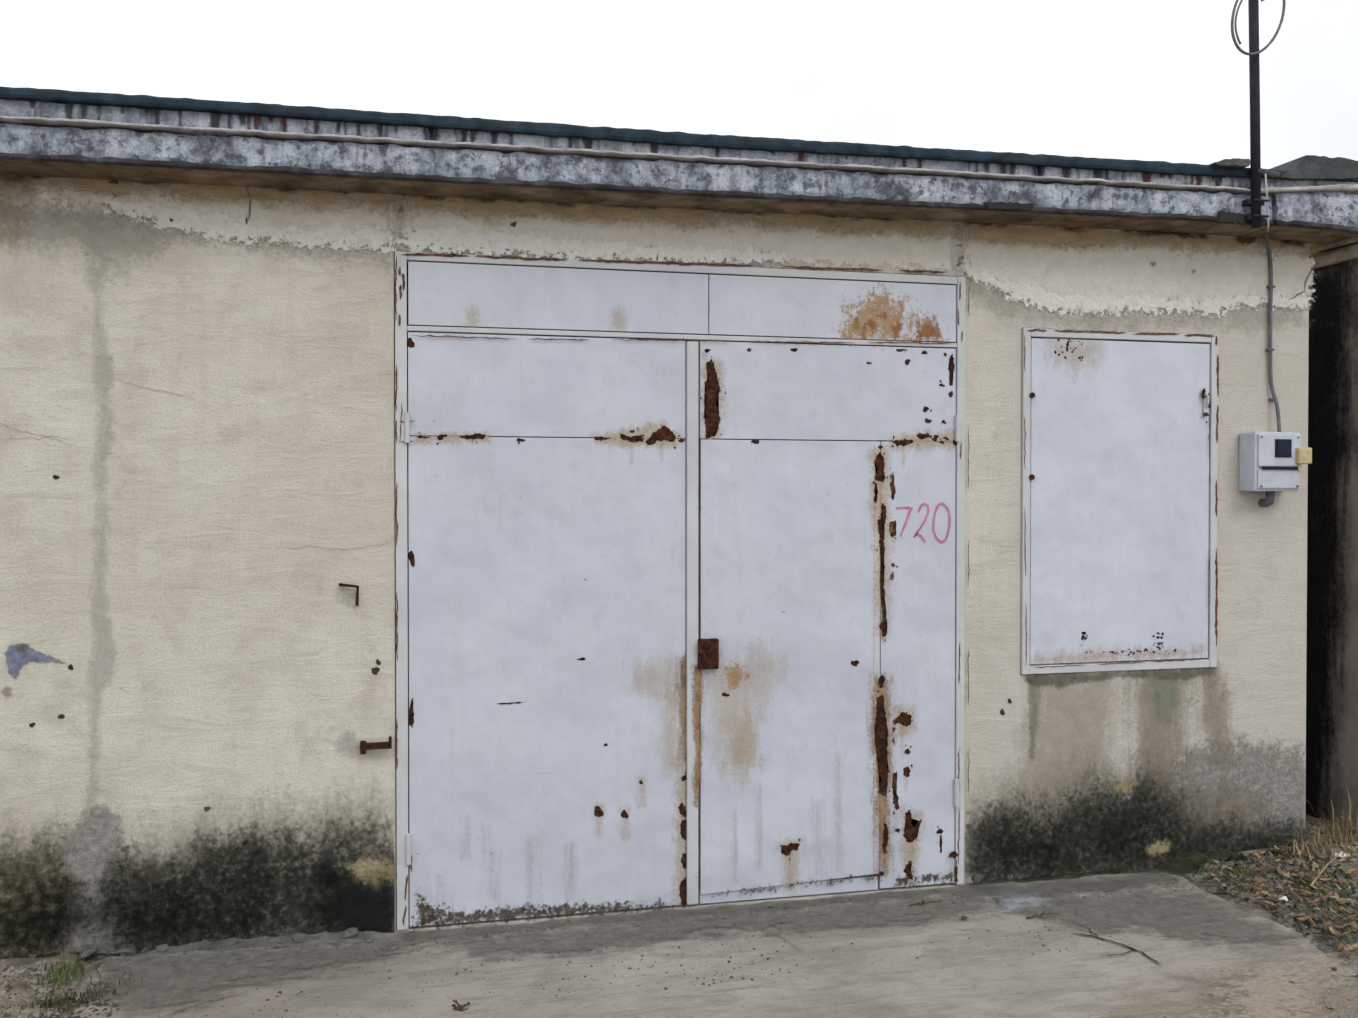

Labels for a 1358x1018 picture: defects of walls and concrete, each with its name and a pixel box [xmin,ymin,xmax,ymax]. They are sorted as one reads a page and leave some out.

rust [394,253,760,348]
rust [594,420,685,449]
peeling [0,182,1316,318]
rust [613,339,728,440]
rust [747,266,970,397]
rust [873,406,969,641]
damp [0,261,1358,1018]
rust [722,665,749,697]
rust [1025,609,1201,668]
rust [676,657,703,905]
rust [870,675,922,881]
rust [936,812,960,885]